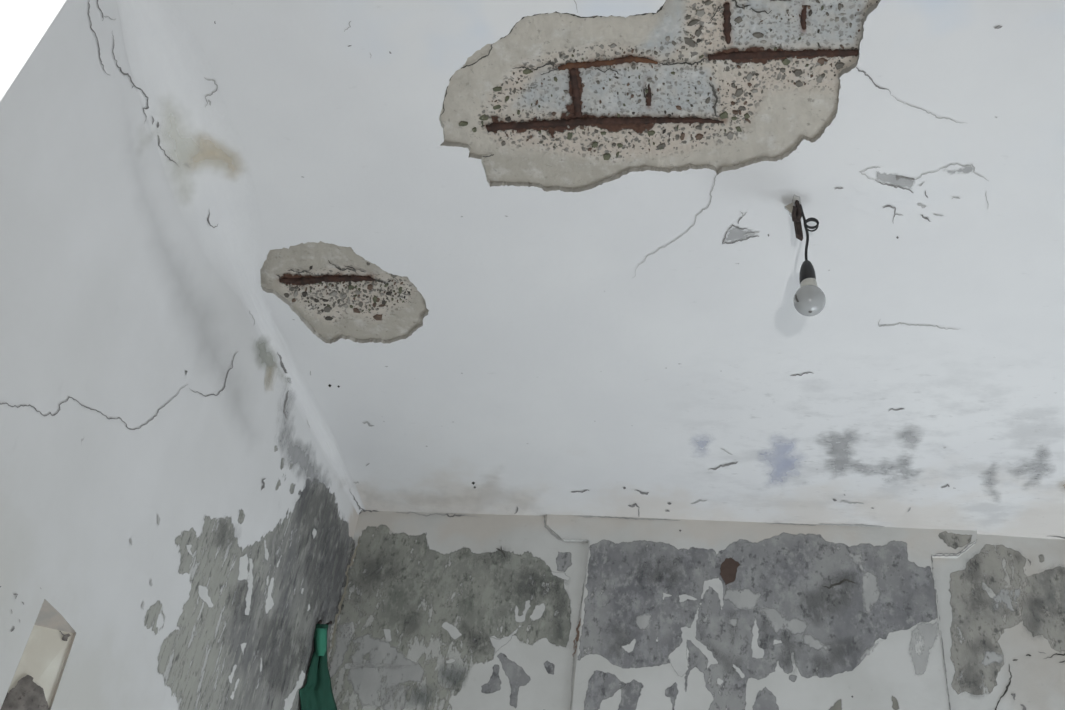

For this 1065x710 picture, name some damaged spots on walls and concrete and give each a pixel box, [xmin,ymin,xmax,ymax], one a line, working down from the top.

crack [88,0,190,168]
spalling [439,0,881,192]
crack [856,67,965,123]
crack [634,173,717,277]
spalling [260,241,429,344]
crack [0,351,239,430]
damp [826,434,865,470]
peeling [145,446,938,710]
peeling [939,531,972,549]
peeling [949,544,1065,695]